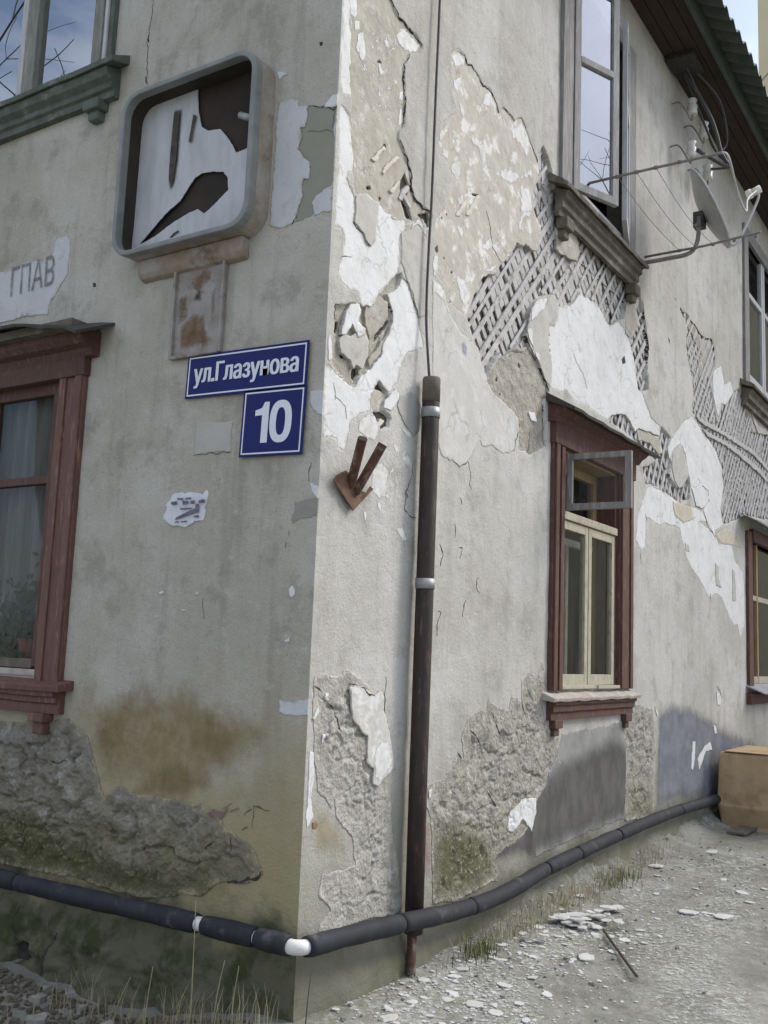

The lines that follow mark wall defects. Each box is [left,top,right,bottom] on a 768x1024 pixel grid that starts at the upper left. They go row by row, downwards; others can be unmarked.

crack [145,5,153,85]
peeling [0,235,71,324]
peeling [269,0,745,643]
peeling [751,413,768,436]
flaking render [0,718,263,898]
flaking render [306,669,403,932]
flaking render [427,663,561,904]
flaking render [624,703,656,822]